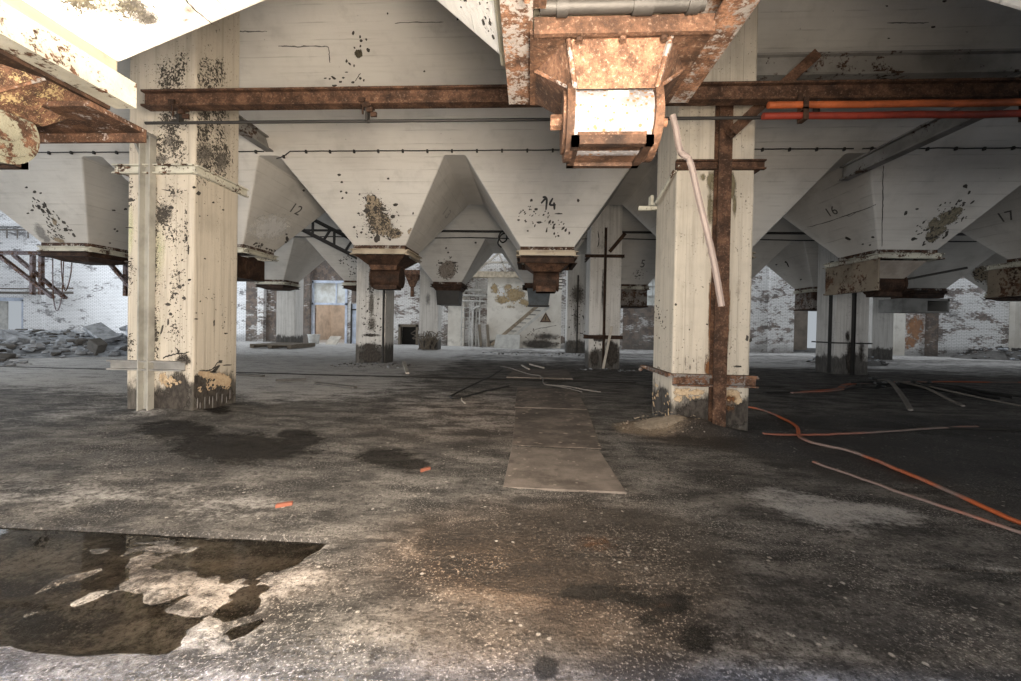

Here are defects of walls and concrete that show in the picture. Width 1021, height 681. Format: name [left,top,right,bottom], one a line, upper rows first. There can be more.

leakage [50,0,157,25]
leakage [148,53,234,89]
leakage [152,111,234,186]
spalling [154,354,234,410]
spalling [652,383,708,421]
spalling [726,389,748,428]